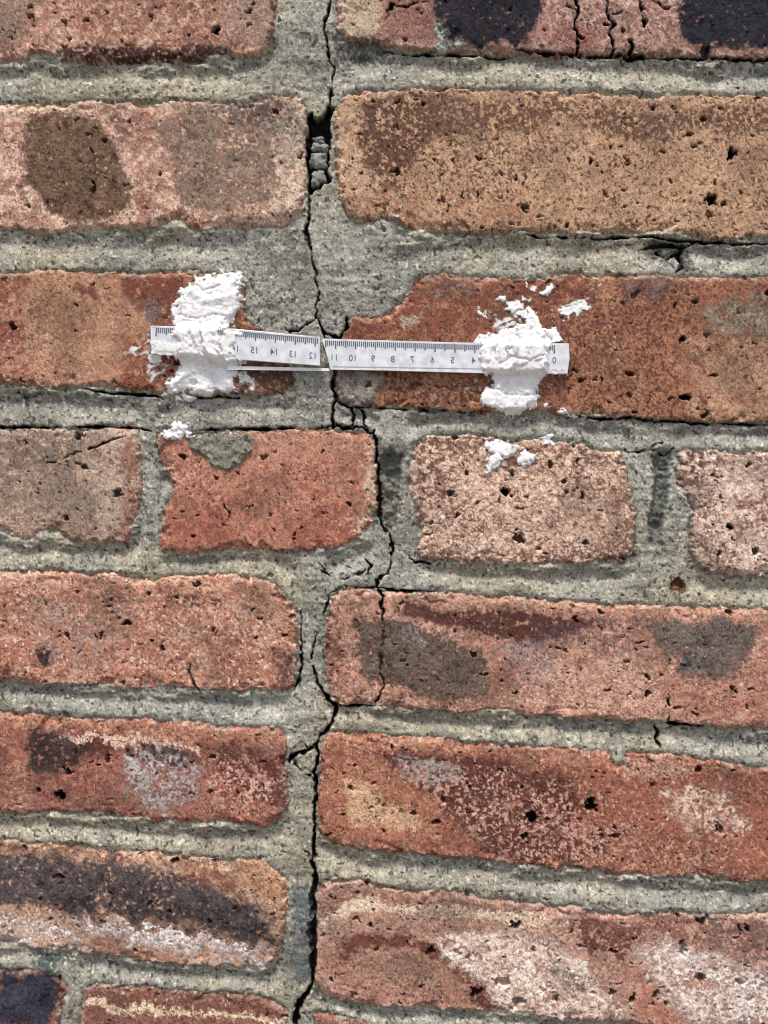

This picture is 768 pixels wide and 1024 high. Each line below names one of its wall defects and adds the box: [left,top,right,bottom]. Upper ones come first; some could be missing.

crack [382,0,768,64]
crack [527,234,765,273]
crack [578,416,768,457]
crack [207,1,461,1024]